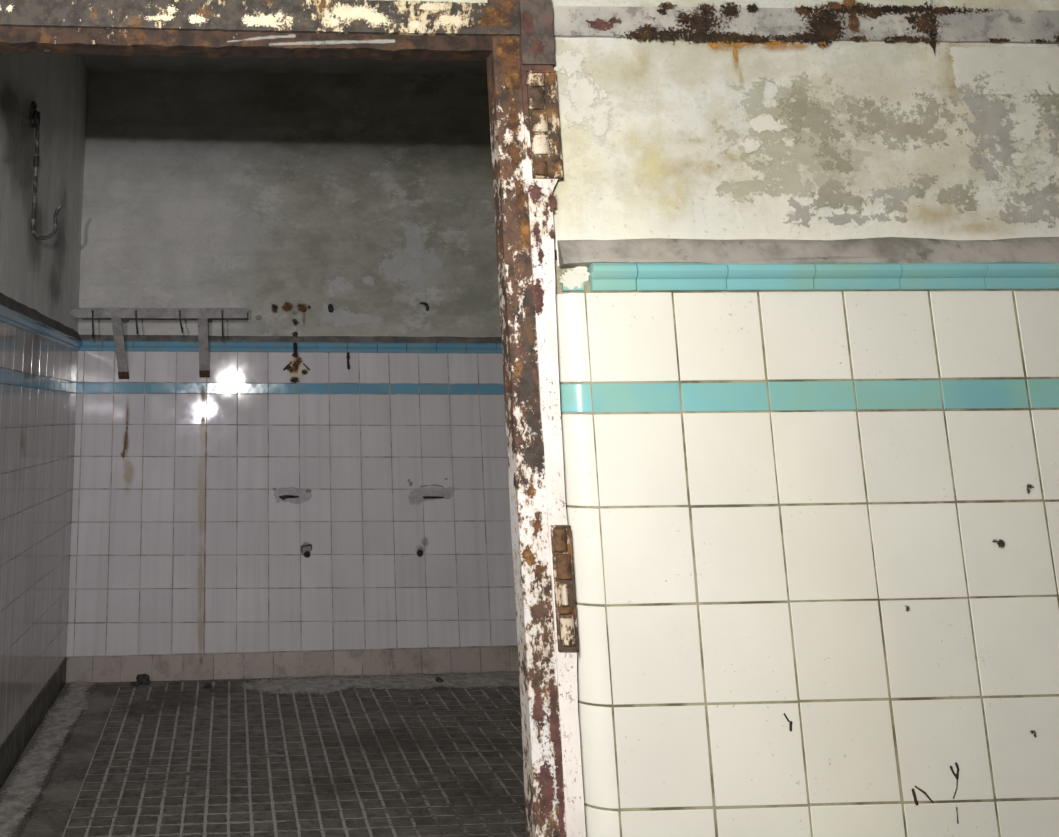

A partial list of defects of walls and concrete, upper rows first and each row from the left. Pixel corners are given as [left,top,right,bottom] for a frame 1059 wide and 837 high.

rust [139,4,209,26]
rust [241,9,294,28]
rust [586,0,1006,75]
peeling [736,71,1059,228]
rust [256,302,311,337]
rust [283,353,310,385]
rust [121,408,132,482]
rust [521,549,544,582]
rust [530,636,566,837]